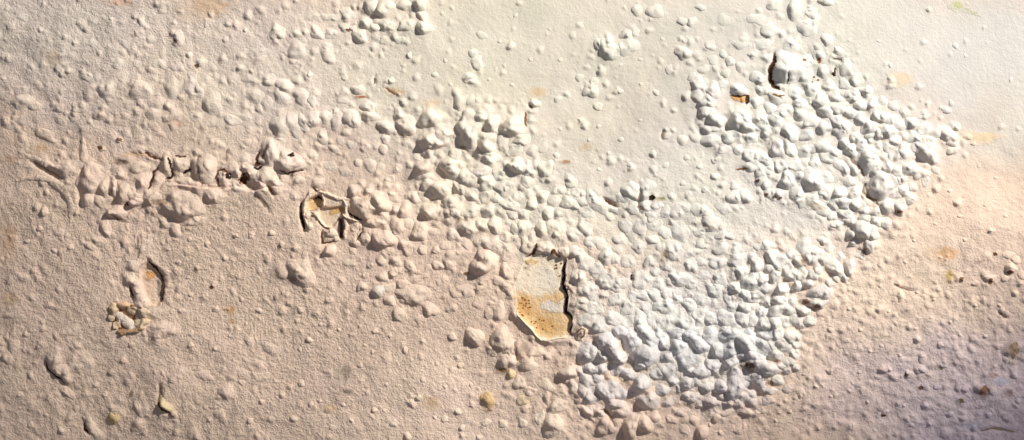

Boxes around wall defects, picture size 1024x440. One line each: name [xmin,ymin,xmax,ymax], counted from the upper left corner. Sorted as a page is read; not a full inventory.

peeling [324,217,344,238]
flaking render [513,254,588,342]